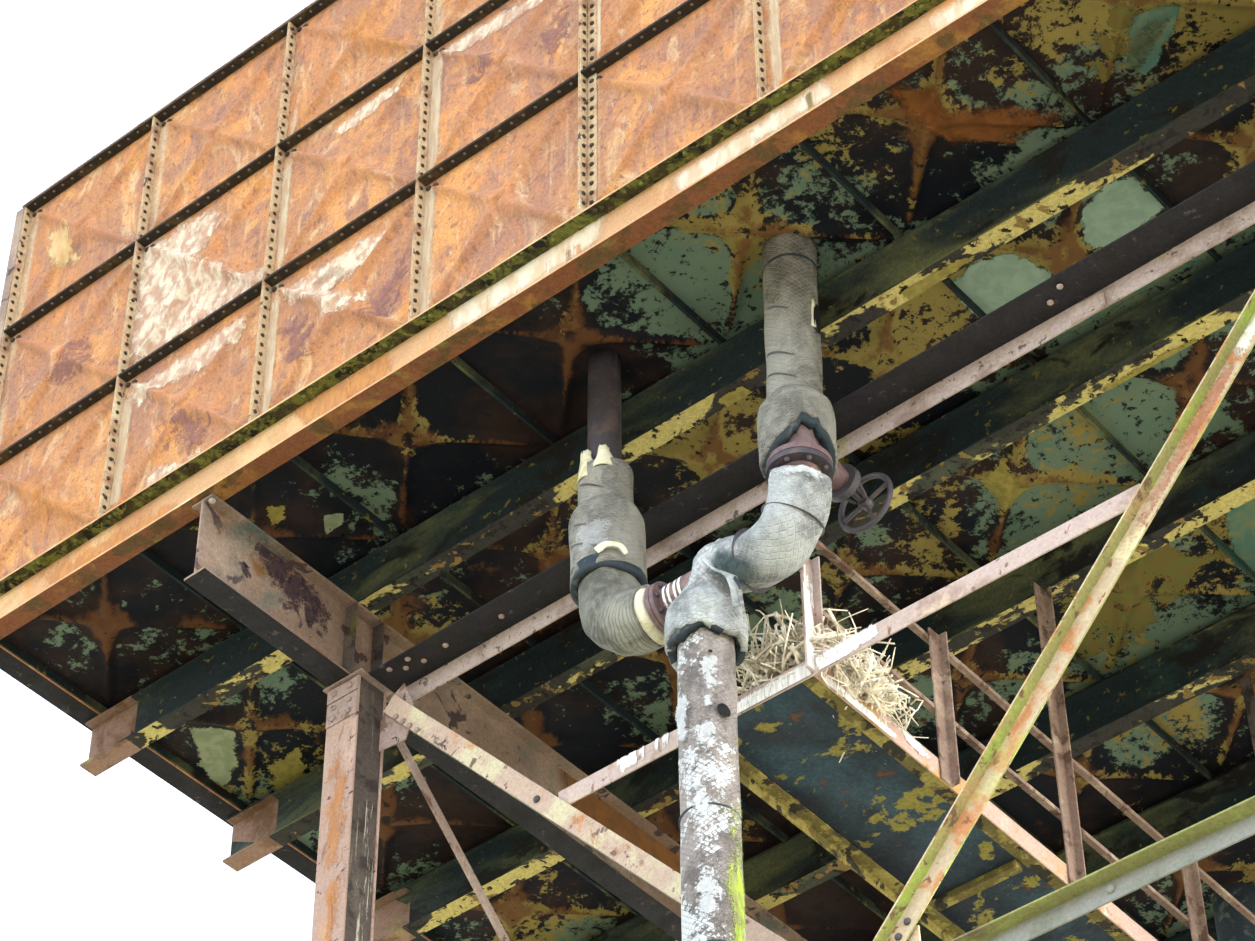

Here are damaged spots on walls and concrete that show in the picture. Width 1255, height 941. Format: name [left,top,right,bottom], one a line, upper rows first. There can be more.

peeling [1080,176,1164,249]
peeling [129,205,264,364]
peeling [901,254,1052,316]
peeling [127,316,246,406]
rust [295,355,391,425]
rust [46,504,175,584]
rust [243,536,339,642]
peeling [1072,498,1255,661]
rust [563,771,578,787]
peeling [675,695,725,842]
rust [324,750,347,941]
rust [571,793,680,874]